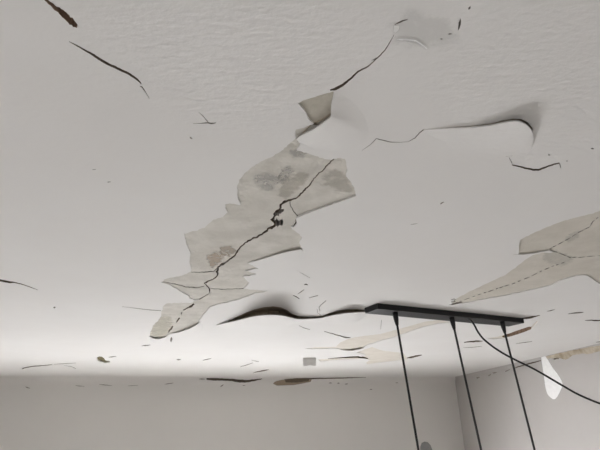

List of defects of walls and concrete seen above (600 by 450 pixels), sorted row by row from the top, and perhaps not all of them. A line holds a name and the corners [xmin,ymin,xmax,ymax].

crack [45,0,77,28]
crack [70,42,149,98]
crack [330,19,408,91]
crack [506,156,561,171]
peeling [143,92,357,346]
crack [166,159,334,333]
peeling [452,211,600,304]
peeling [303,320,448,366]
crack [202,360,269,383]